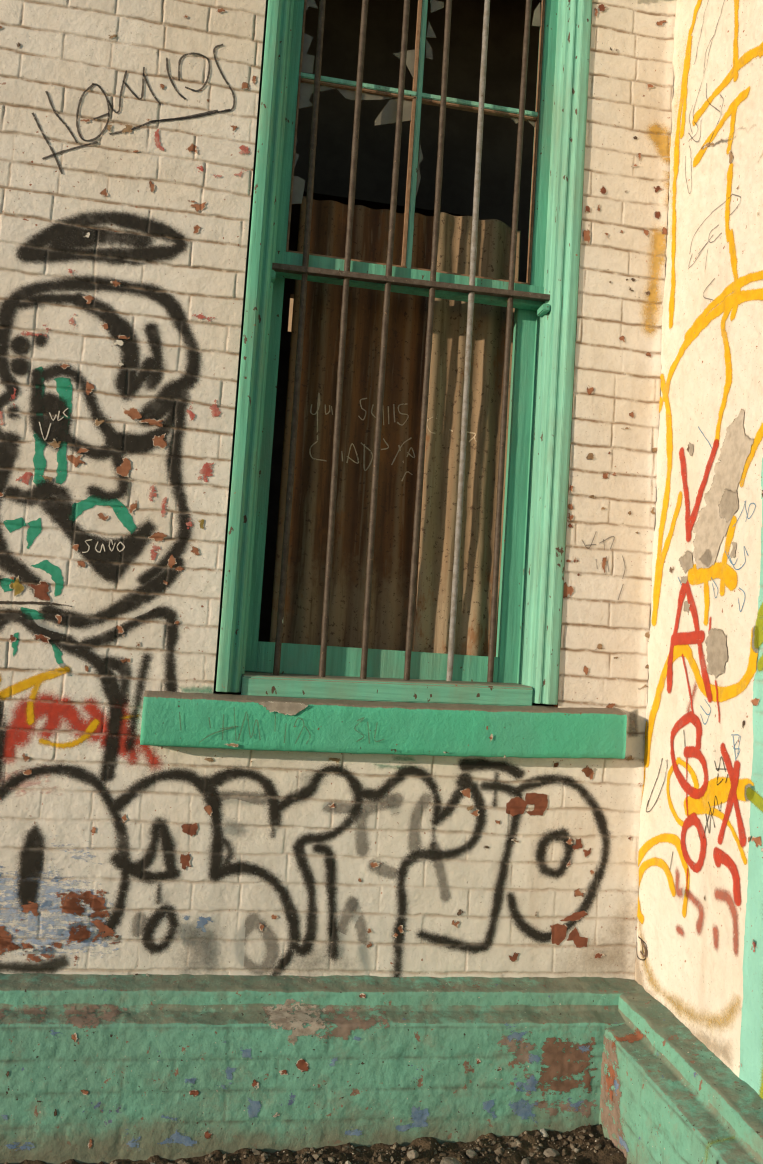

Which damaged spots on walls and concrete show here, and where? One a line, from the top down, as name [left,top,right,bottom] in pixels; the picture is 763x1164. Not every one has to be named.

spalling [669,409,754,584]
spalling [705,628,728,678]
peeling [581,765,595,780]
peeling [460,788,480,817]
spalling [495,792,548,825]
peeling [566,837,595,875]
peeling [0,843,120,966]
spalling [550,888,605,959]
peeling [262,993,396,1046]
peeling [279,1059,309,1075]
spalling [497,1023,649,1158]